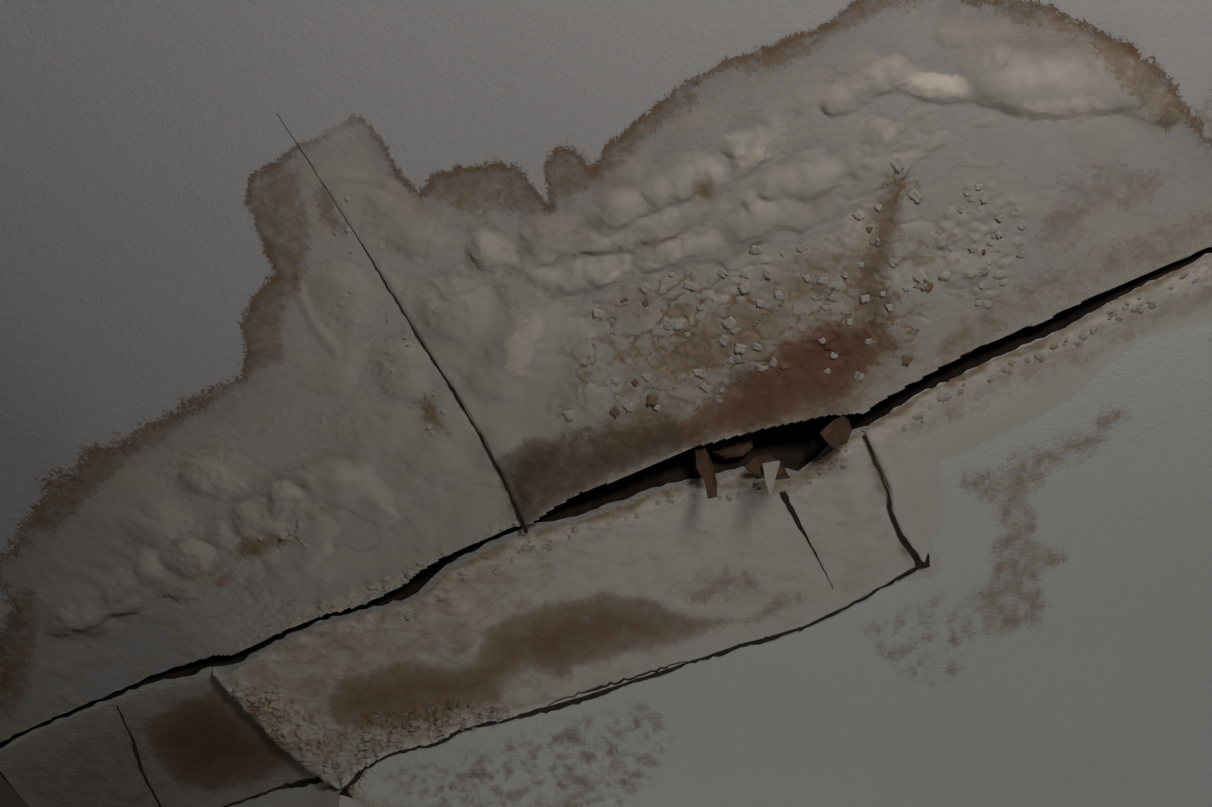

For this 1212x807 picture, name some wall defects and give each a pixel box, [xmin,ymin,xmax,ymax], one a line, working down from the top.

leakage [380,0,862,215]
leakage [961,0,1212,143]
leakage [0,146,298,690]
crack [0,114,1212,749]
peeling [178,156,1212,665]
leakage [331,596,722,728]
crack [116,705,162,807]
crack [223,777,324,807]
peeling [216,672,526,800]